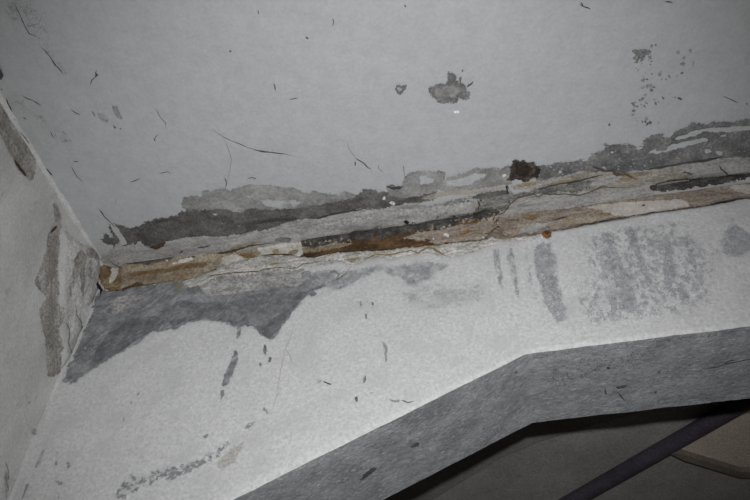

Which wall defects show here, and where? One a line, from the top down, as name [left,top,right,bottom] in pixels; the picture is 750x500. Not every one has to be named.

peeling [35,44,750,385]
corrosion [300,213,502,258]
crack [564,197,750,229]
leakage [492,247,519,302]
leakage [525,218,750,334]
peeling [220,350,238,399]